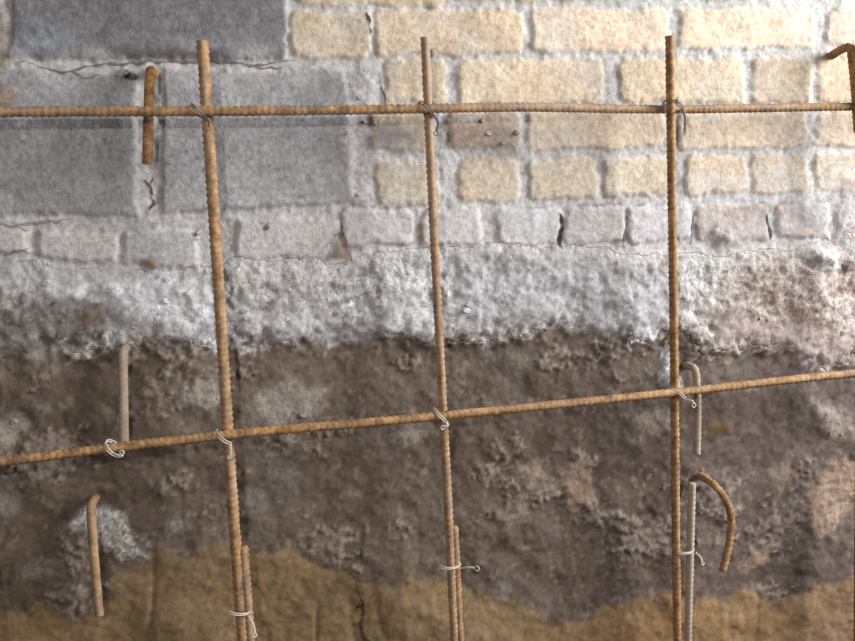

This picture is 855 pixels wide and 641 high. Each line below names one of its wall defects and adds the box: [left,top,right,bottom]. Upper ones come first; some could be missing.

crack [18,59,292,79]
crack [144,170,156,214]
crack [557,213,565,249]
damp [36,258,214,338]
damp [238,297,435,338]
damp [714,312,849,364]
damp [658,348,681,388]
crack [354,584,370,641]